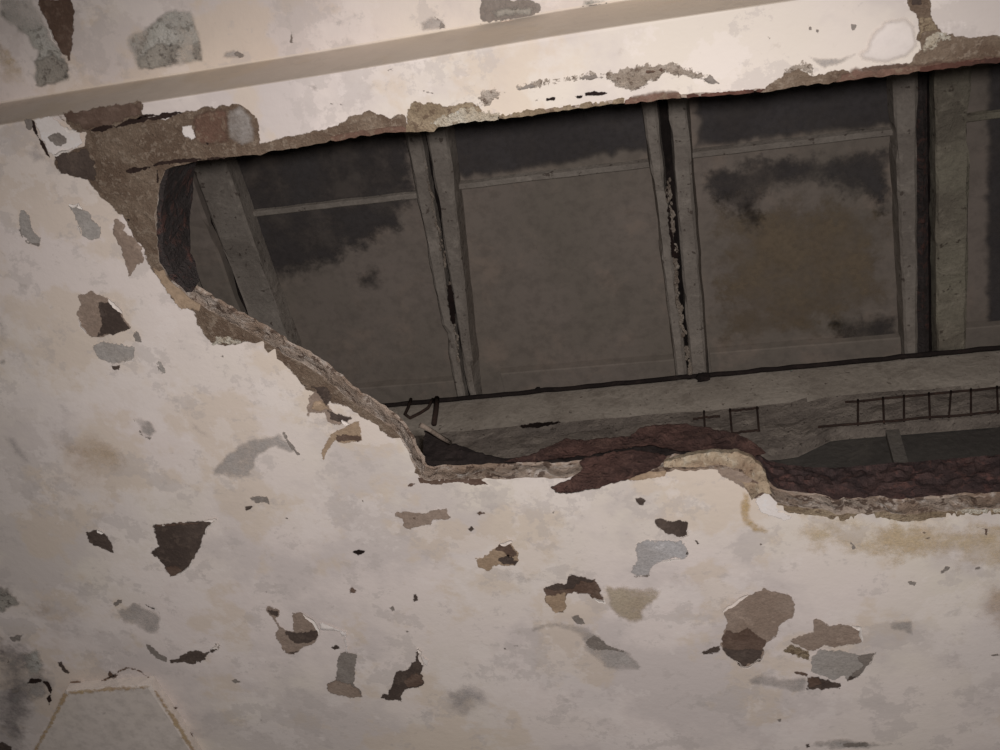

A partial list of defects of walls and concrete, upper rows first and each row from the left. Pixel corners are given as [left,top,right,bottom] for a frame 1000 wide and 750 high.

water stain [236,132,413,273]
water stain [706,151,888,222]
flaking render [53,90,681,460]
water stain [833,318,894,338]
rust [504,423,766,493]
peeling [151,518,217,576]
peeling [631,518,699,577]
peeling [266,606,362,698]
peeling [381,649,428,701]
peeling [544,575,638,668]
peeling [702,588,795,669]
peeling [784,619,876,690]